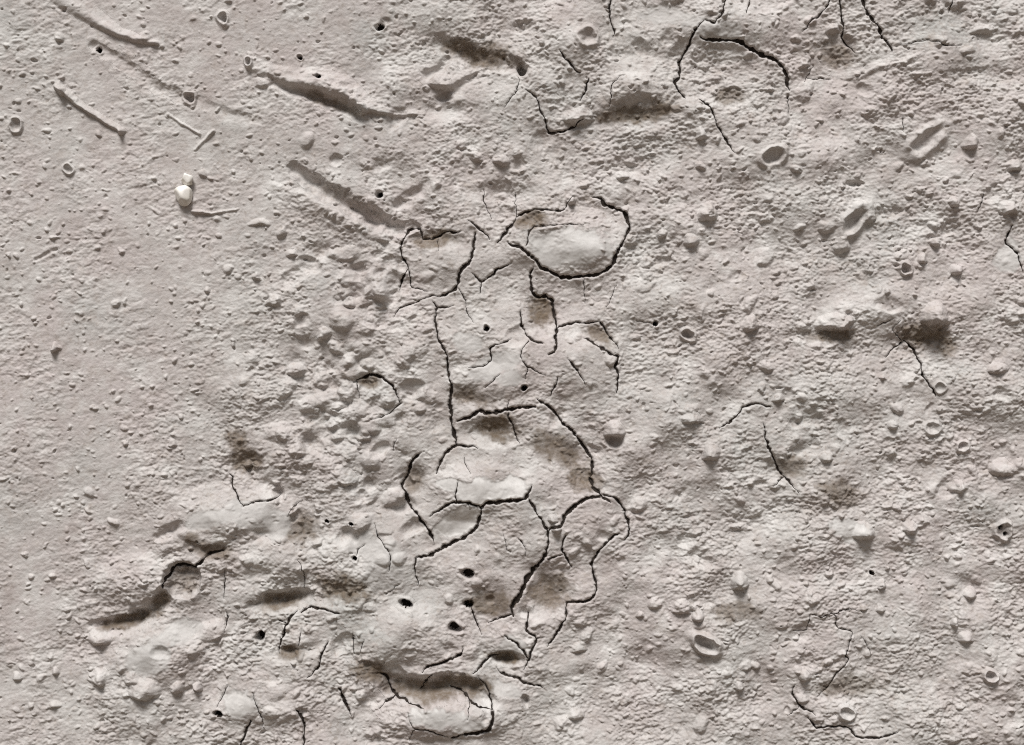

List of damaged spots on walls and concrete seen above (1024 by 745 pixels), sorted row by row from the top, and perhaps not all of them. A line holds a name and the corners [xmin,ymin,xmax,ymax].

crack [802,0,959,52]
crack [506,51,618,134]
crack [673,0,829,153]
crack [880,320,936,396]
crack [229,473,303,514]
crack [356,191,631,740]
crack [719,403,799,493]
crack [161,550,229,630]
crack [790,608,899,739]